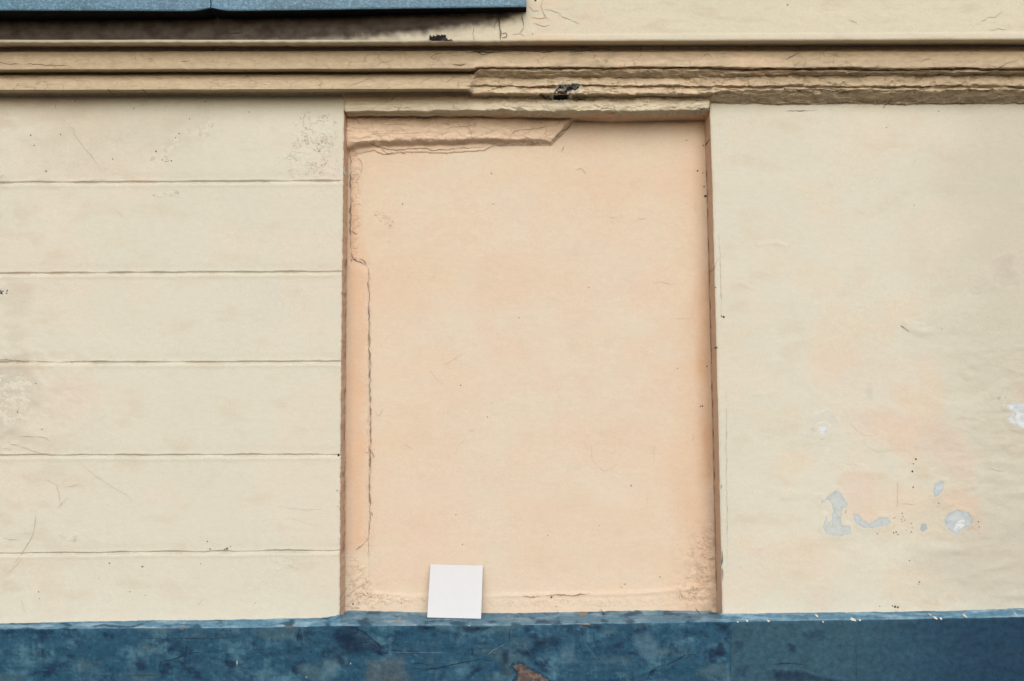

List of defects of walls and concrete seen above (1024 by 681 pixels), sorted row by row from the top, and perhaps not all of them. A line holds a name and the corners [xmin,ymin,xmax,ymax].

spalling [550,82,583,103]
crack [344,91,599,558]
peeling [997,395,1024,434]
peeling [810,483,857,543]
peeling [893,505,979,539]